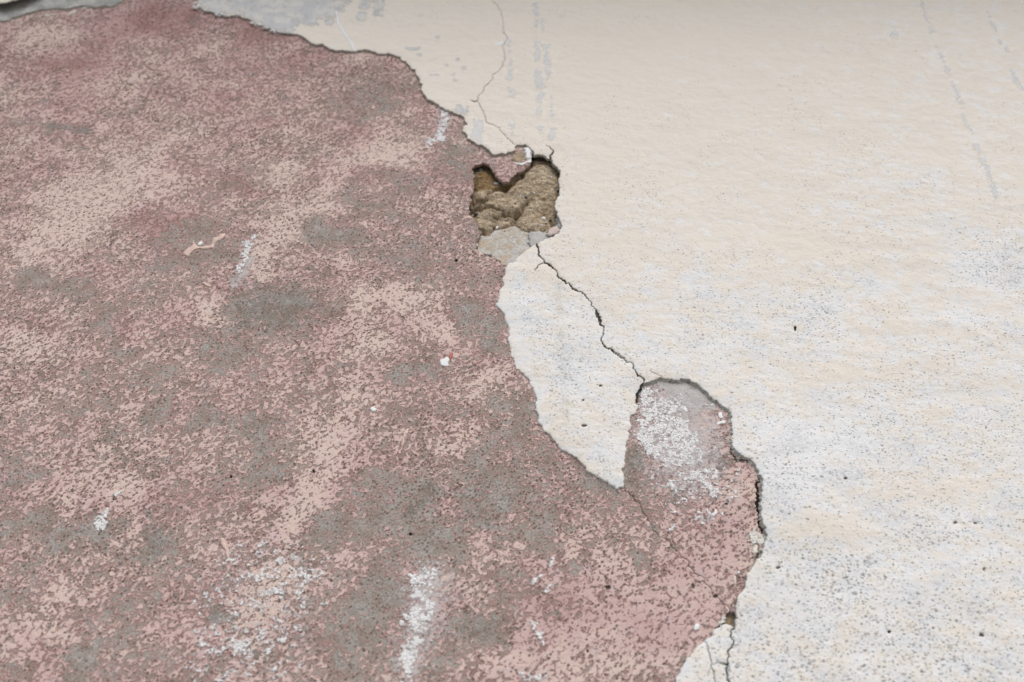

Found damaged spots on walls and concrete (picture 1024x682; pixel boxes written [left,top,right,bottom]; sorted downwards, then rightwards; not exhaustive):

flaking render [0,0,765,682]
crack [536,244,614,354]
damp [635,382,728,495]